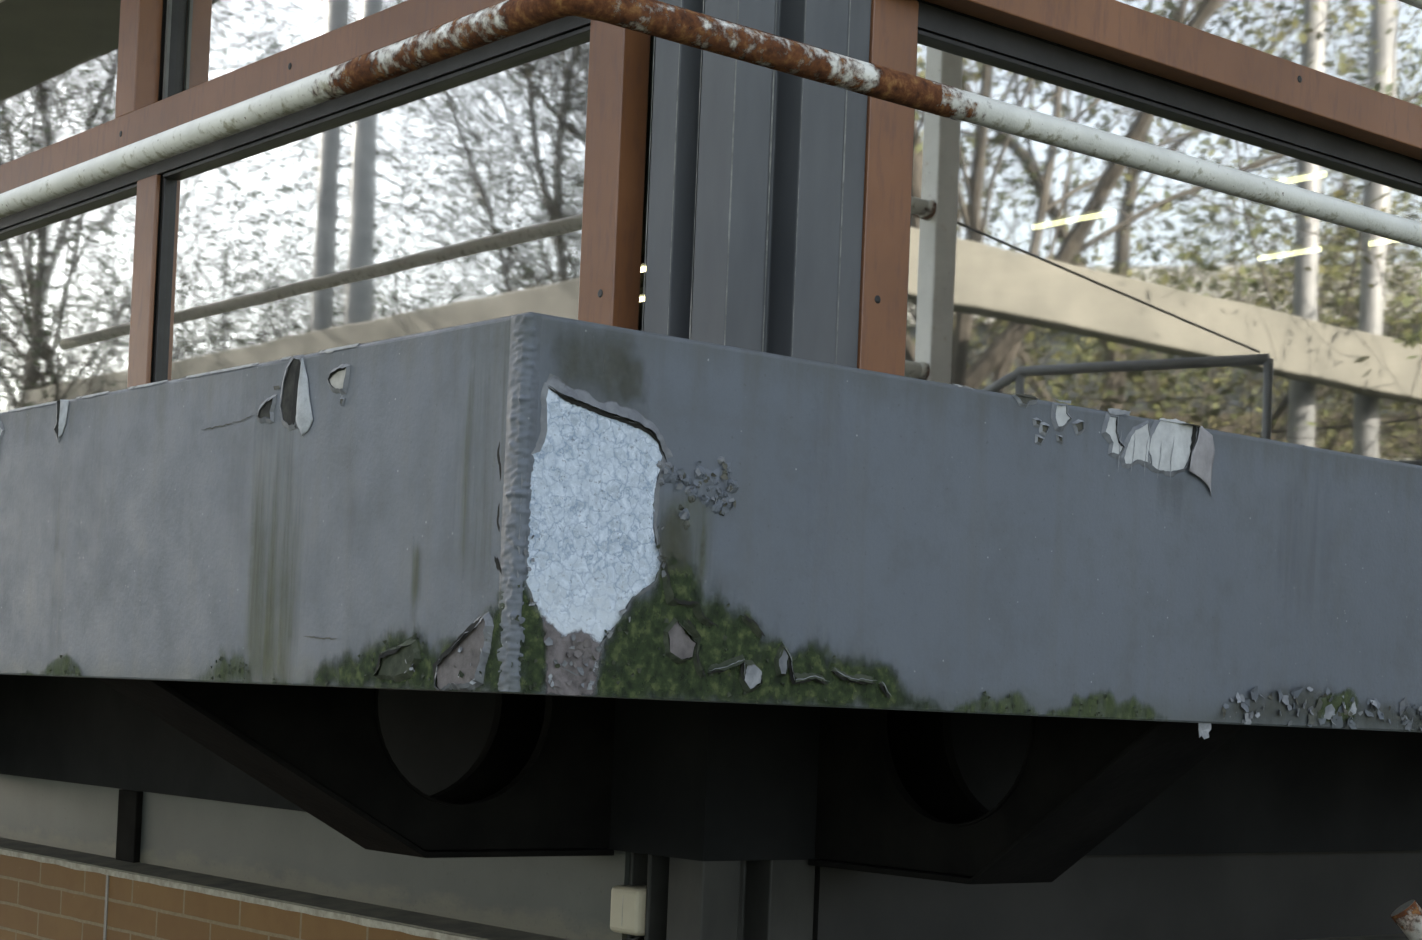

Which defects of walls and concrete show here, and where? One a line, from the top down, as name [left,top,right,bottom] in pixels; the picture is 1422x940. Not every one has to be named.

corrosion [313,0,985,126]
peeling [0,391,110,443]
peeling [127,362,260,389]
peeling [257,343,362,436]
peeling [1012,394,1084,446]
peeling [1101,408,1215,493]
peeling [517,373,673,696]
peeling [373,611,494,692]
peeling [1198,686,1422,739]
corrosion [1390,899,1422,931]